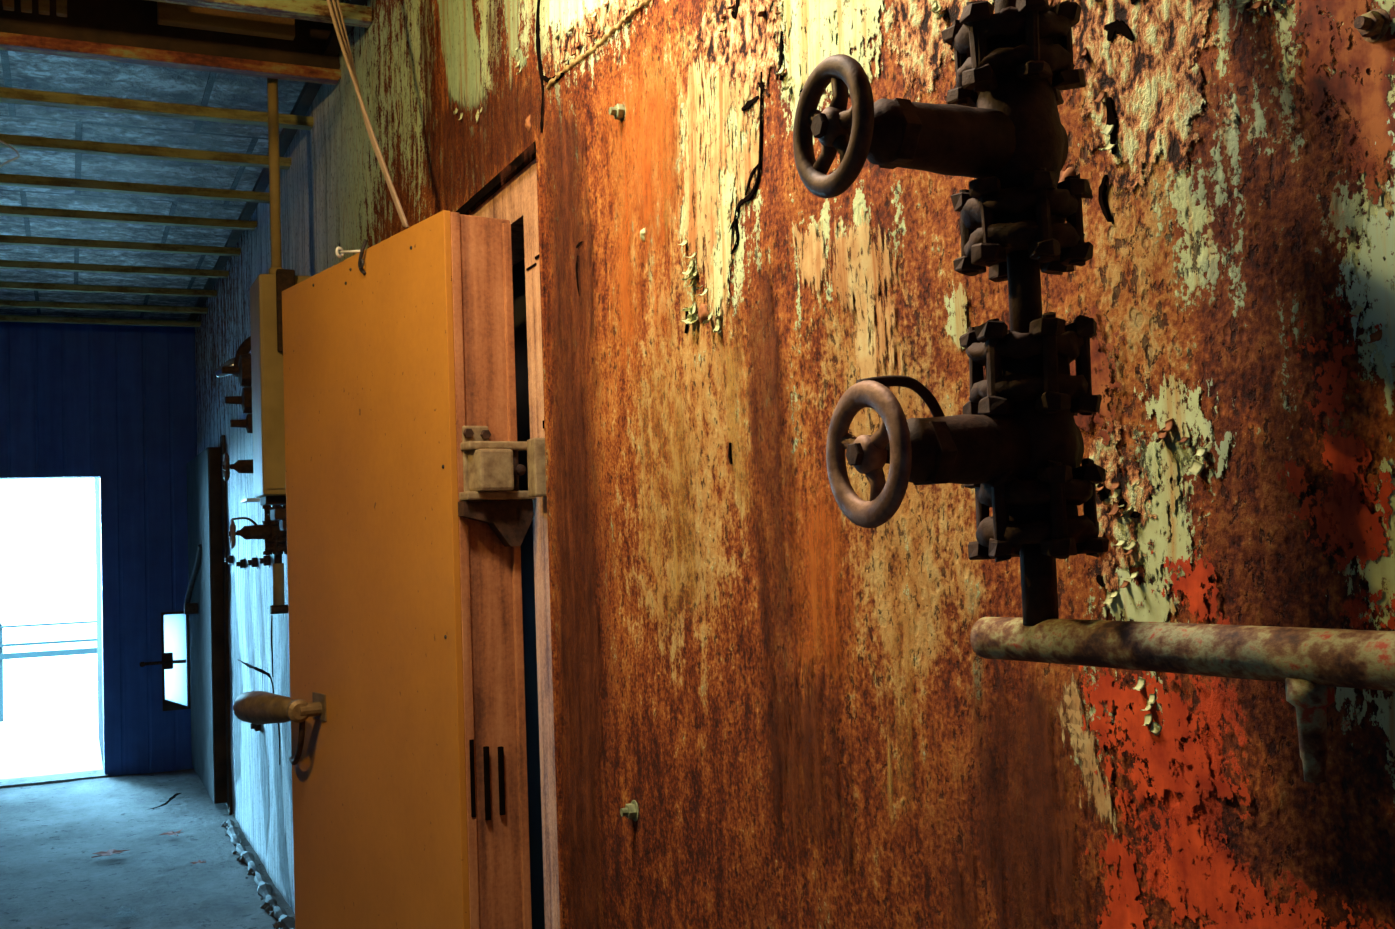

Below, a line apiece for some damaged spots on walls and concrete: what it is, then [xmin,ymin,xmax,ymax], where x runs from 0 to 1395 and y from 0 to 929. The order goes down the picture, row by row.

peeling [437,0,484,123]
rust [418,0,545,213]
rust [611,62,677,355]
peeling [678,2,760,334]
peeling [757,0,885,95]
rust [1058,167,1075,183]
rust [1270,0,1395,249]
peeling [1332,57,1395,384]
rust [726,273,838,807]
rust [1061,303,1125,452]
peeling [1096,373,1236,623]
peeling [1057,673,1117,840]